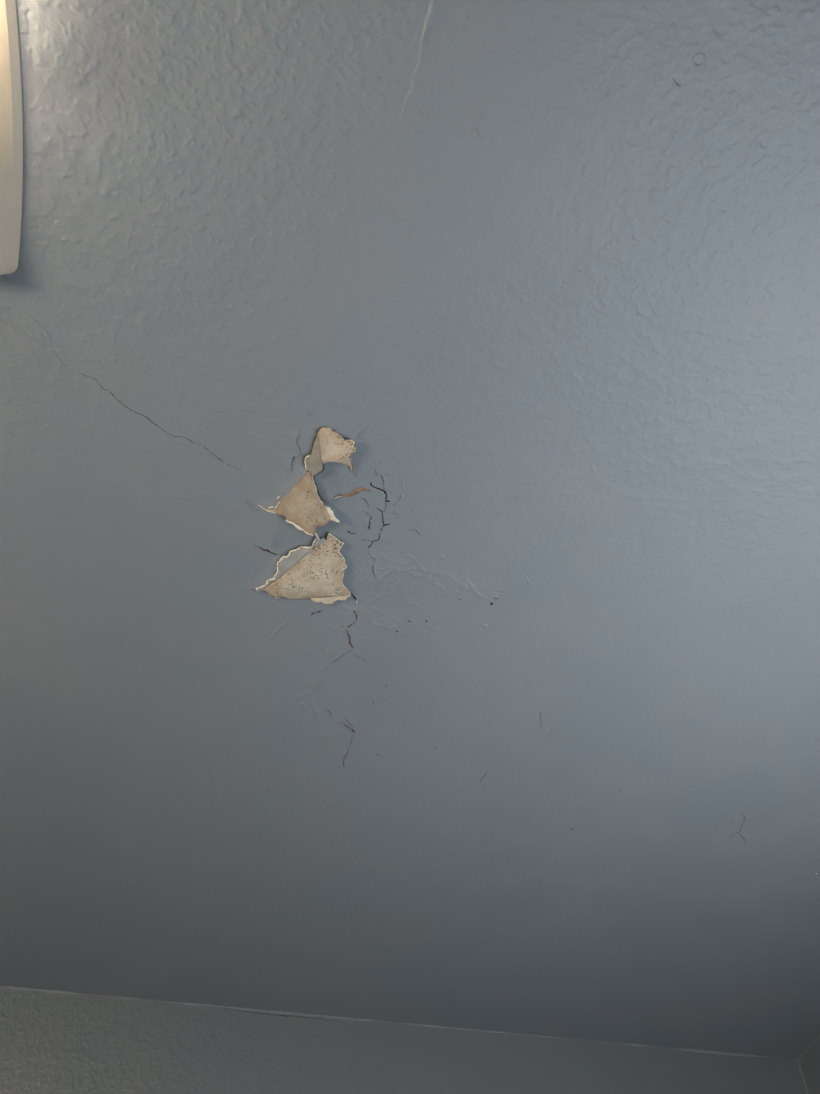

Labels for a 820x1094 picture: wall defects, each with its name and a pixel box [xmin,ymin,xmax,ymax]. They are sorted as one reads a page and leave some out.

crack [254,543,278,555]
peeling [244,427,372,604]
crack [347,469,396,578]
crack [311,592,365,664]